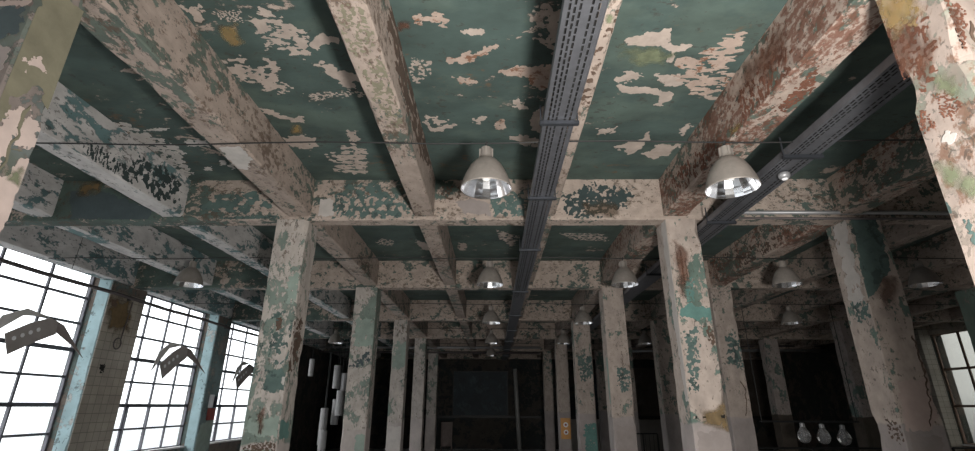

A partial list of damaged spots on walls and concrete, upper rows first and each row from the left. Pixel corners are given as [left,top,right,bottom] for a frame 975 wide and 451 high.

peeling [412,11,450,28]
peeling [22,56,47,74]
peeling [178,4,390,101]
peeling [409,58,432,83]
peeling [446,28,499,85]
peeling [498,3,561,91]
peeling [614,28,748,106]
peeling [259,108,368,190]
peeling [378,96,457,132]
peeling [472,98,544,147]
peeling [614,123,694,159]
peeling [941,130,957,145]